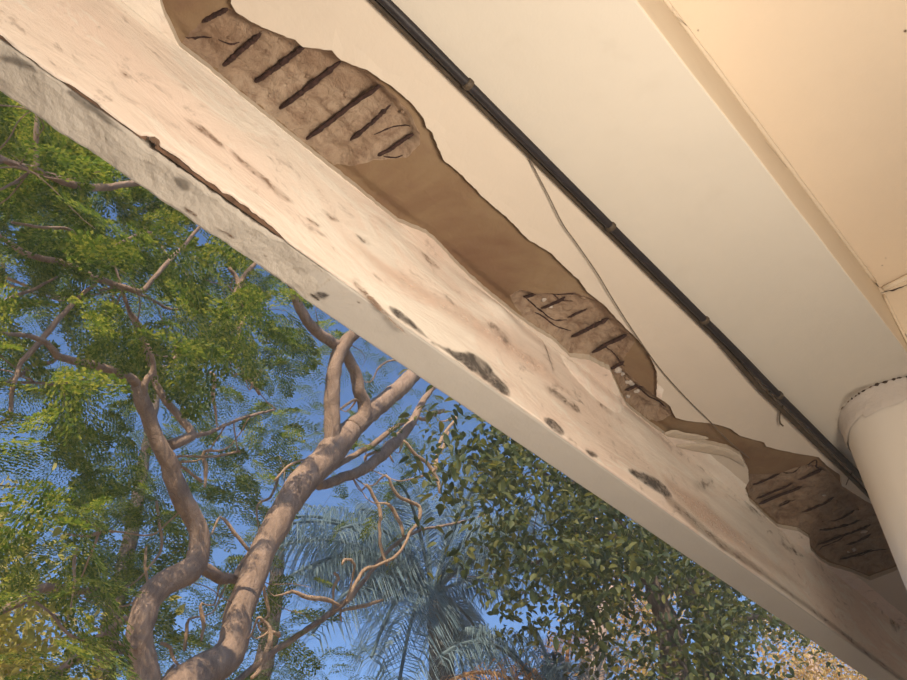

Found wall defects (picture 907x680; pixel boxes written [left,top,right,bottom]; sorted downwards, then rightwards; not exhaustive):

spalling [162,0,907,576]
damp [445,349,508,395]
damp [631,470,670,496]